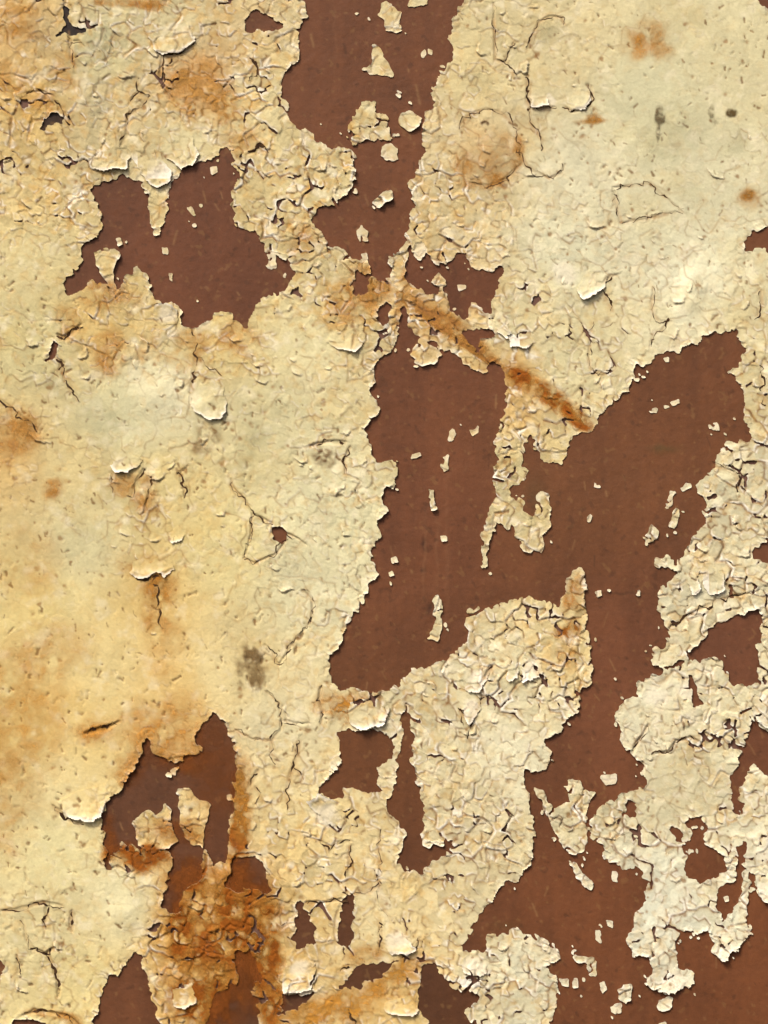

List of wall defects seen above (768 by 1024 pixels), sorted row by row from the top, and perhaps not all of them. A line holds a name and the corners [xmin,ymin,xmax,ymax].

crack [459,5,595,189]
peeling [61,121,298,334]
rust [337,273,593,432]
peeling [241,0,768,1024]
crack [87,722,117,734]
rust [118,722,196,785]
peeling [58,706,275,914]
crack [633,728,694,755]
rust [102,773,419,1024]
crack [307,829,418,958]
peeling [88,948,164,1024]
peeling [173,983,196,1009]